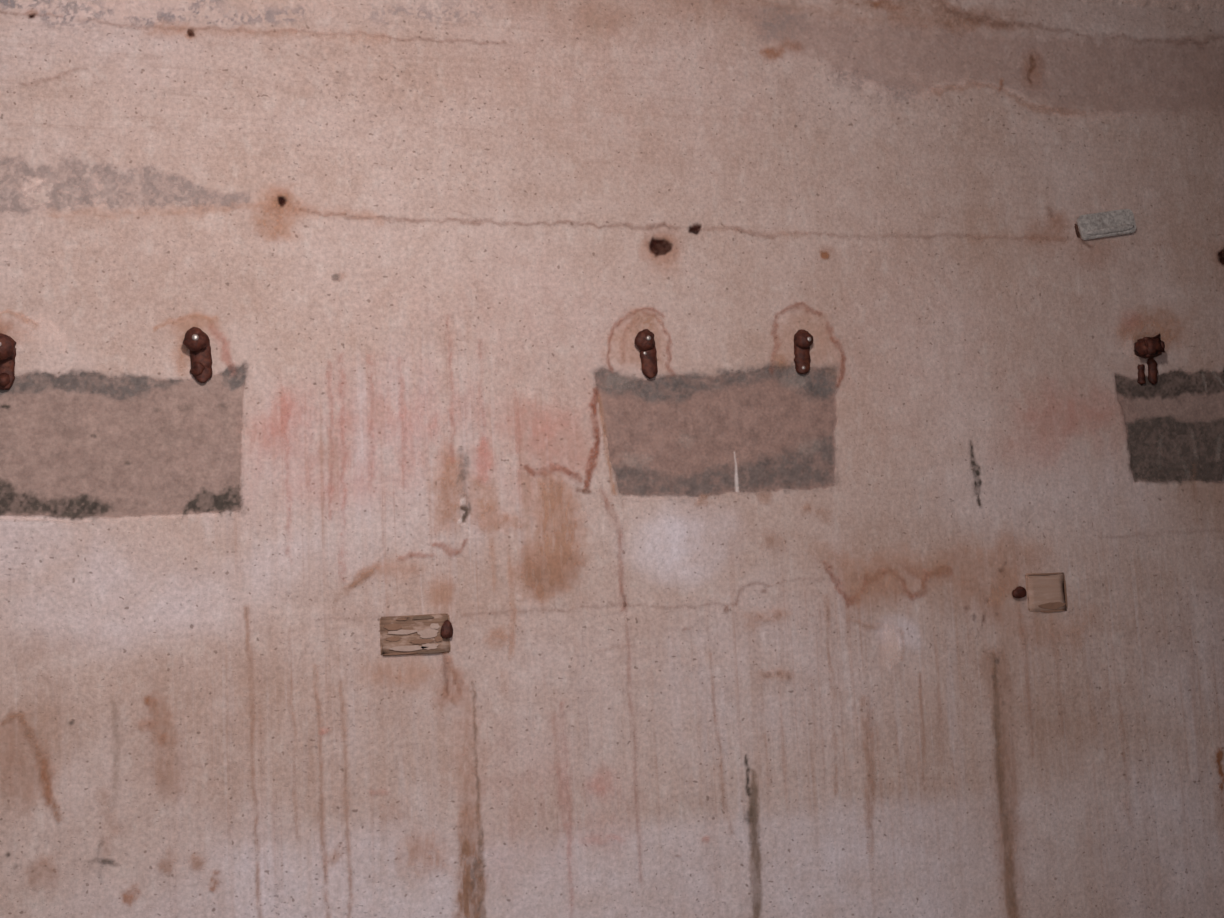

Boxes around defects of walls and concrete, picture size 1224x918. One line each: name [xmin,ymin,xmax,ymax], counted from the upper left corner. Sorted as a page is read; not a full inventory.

water stain [521,484,577,598]
water stain [745,755,760,872]
water stain [458,836,483,918]